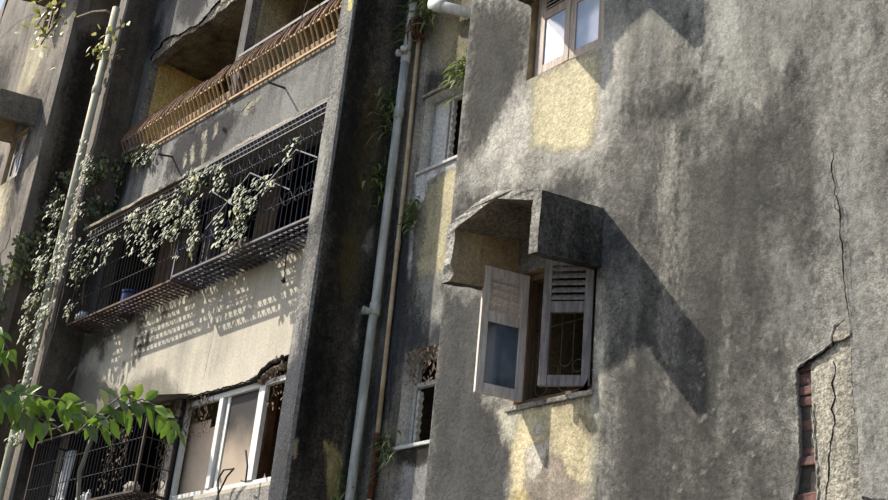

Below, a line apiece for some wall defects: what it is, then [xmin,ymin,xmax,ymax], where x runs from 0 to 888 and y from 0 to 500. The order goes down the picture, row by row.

leakage [111,158,132,213]
leakage [177,0,205,26]
spalling [150,0,246,66]
leakage [163,53,332,181]
leakage [269,0,377,500]
leakage [424,0,888,221]
leakage [658,125,677,253]
crack [831,147,849,315]
leakage [71,237,304,432]
flaking render [792,311,885,500]